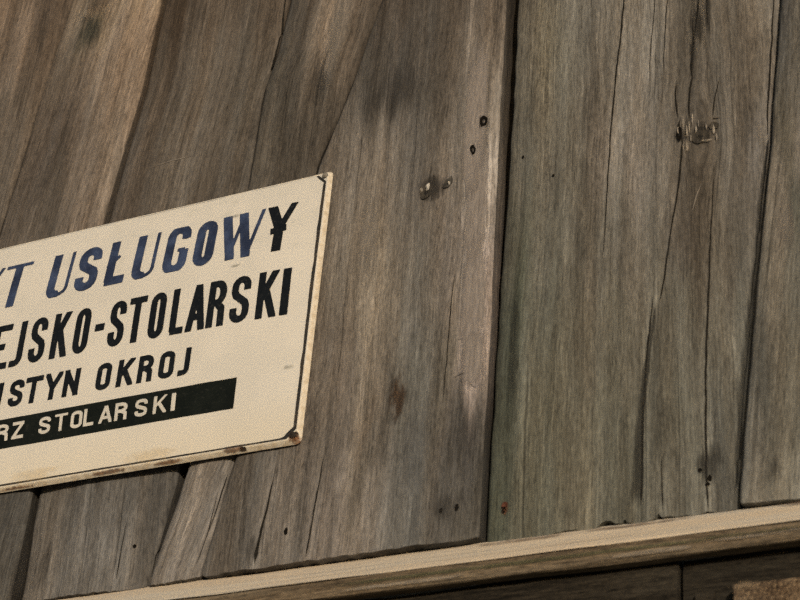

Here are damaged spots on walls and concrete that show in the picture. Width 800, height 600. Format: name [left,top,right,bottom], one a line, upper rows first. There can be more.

crack [603,0,625,251]
crack [635,0,694,509]
crack [704,179,714,503]